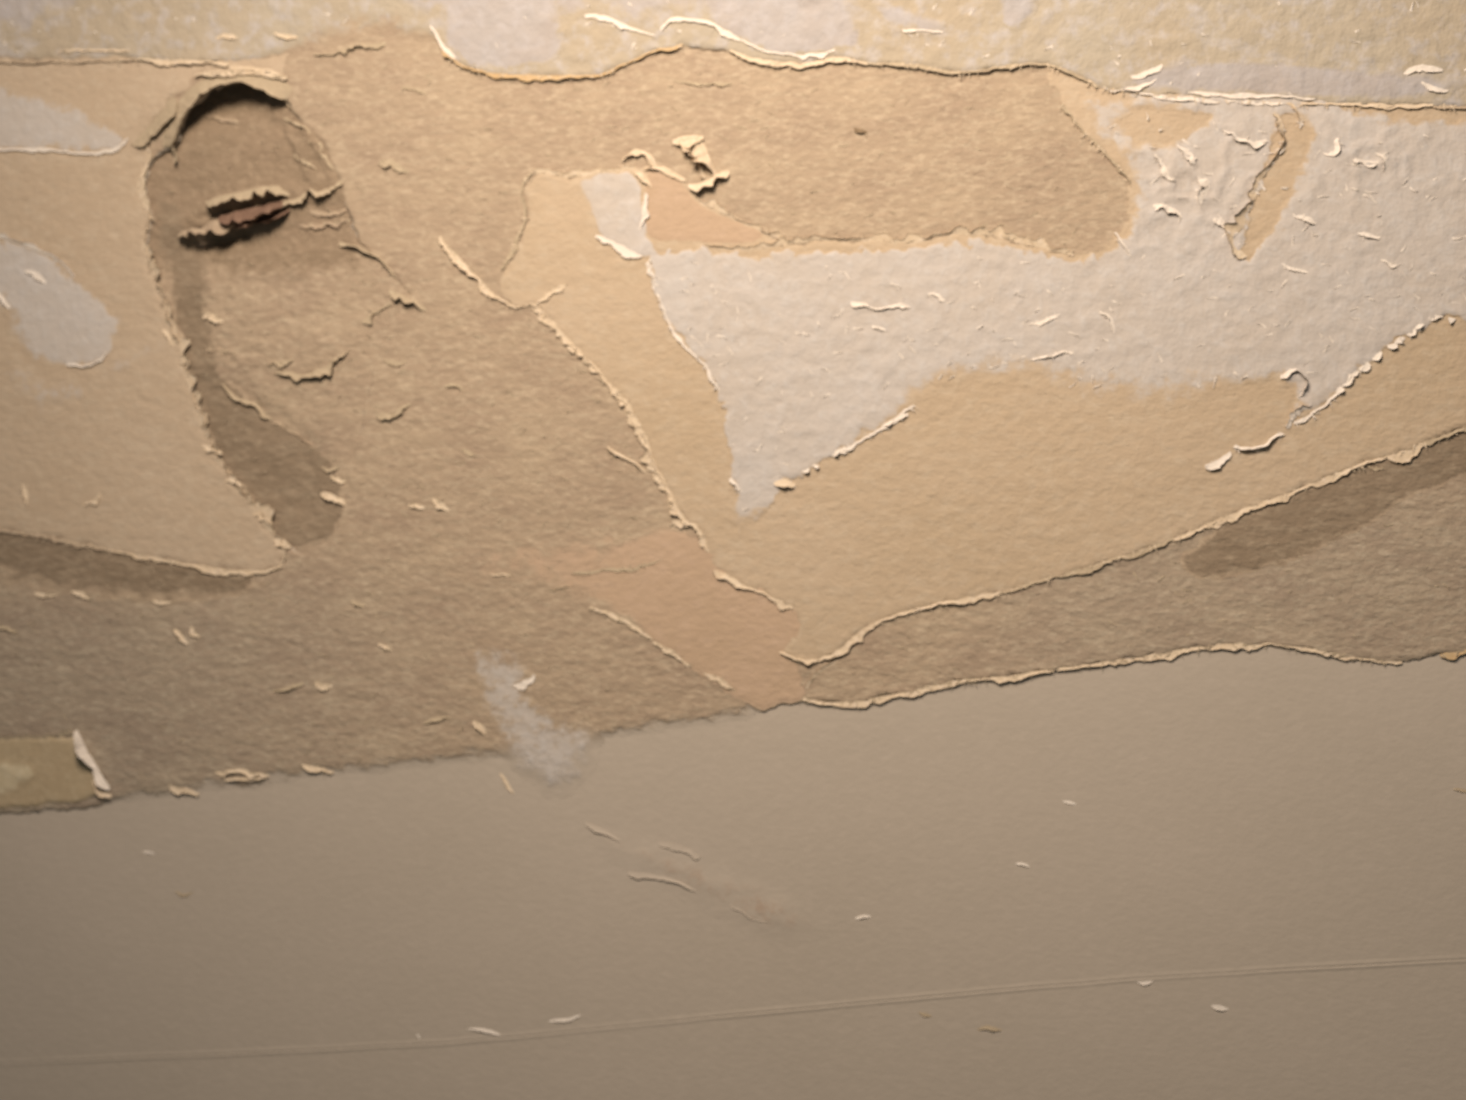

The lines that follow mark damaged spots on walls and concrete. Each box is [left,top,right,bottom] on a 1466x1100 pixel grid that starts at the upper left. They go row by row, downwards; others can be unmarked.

spalling [0,0,1466,554]
damp [1180,431,1466,580]
peeling [512,674,535,690]